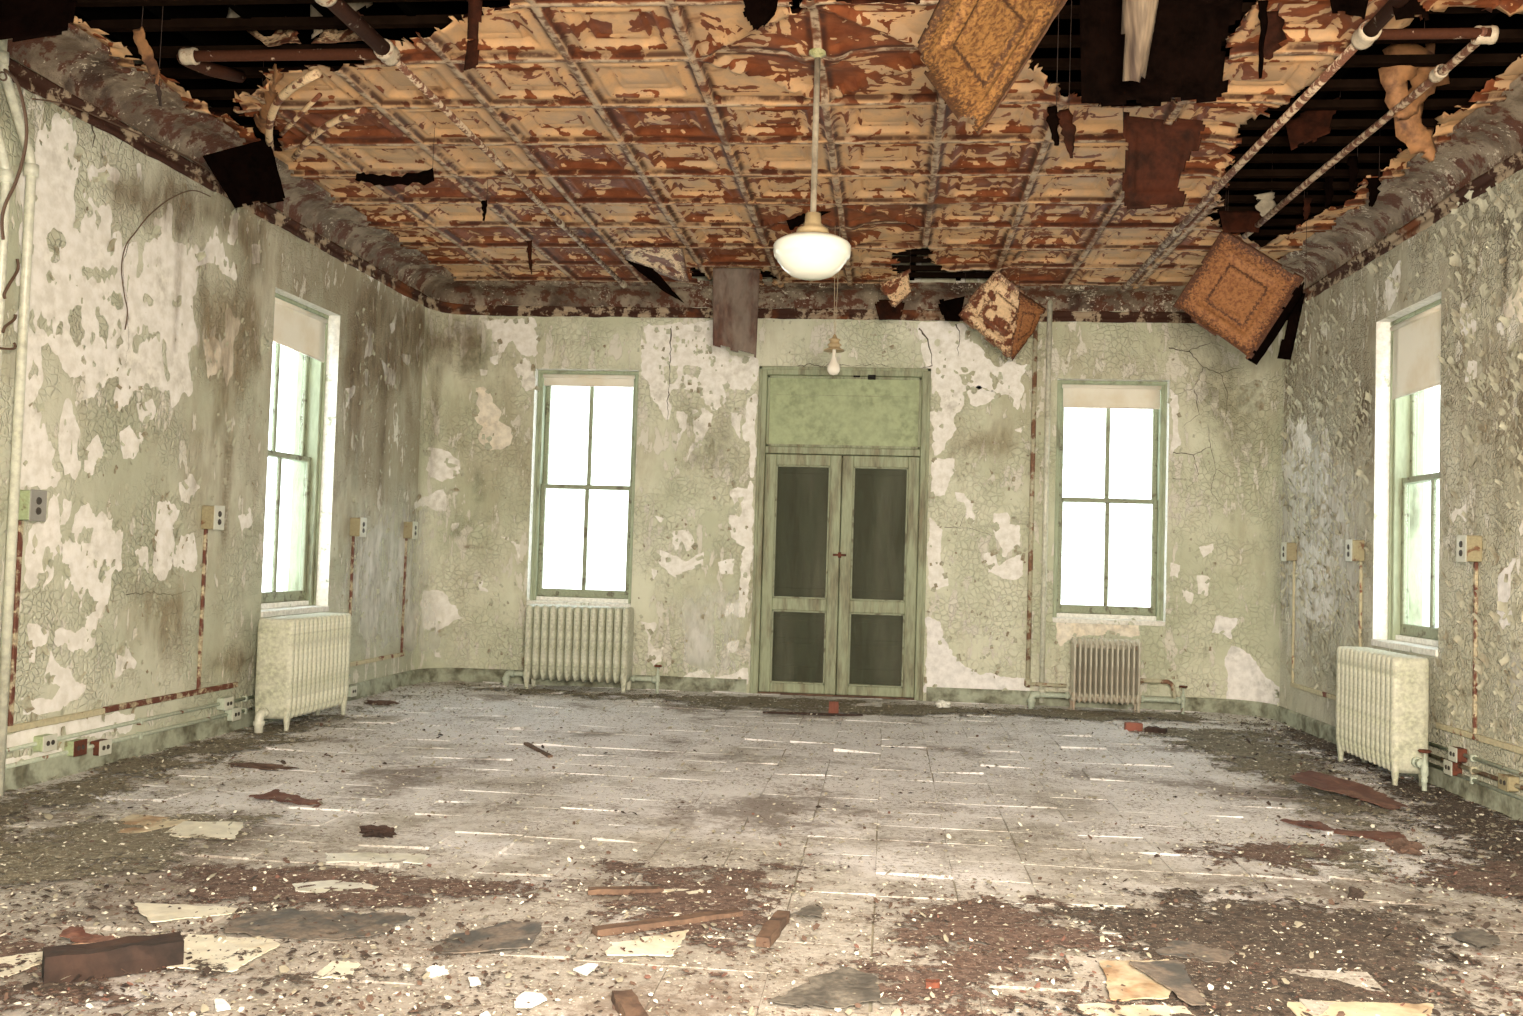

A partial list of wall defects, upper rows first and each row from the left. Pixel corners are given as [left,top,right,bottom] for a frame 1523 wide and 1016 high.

peeling [1385,260,1401,311]
peeling [1496,260,1523,335]
peeling [1450,300,1477,382]
peeling [471,315,542,451]
peeling [6,113,260,764]
peeling [640,320,759,619]
peeling [917,321,1030,580]
peeling [1281,414,1330,514]
peeling [927,517,949,592]
peeling [640,621,663,666]
peeling [677,668,749,685]
peeling [923,616,1030,693]